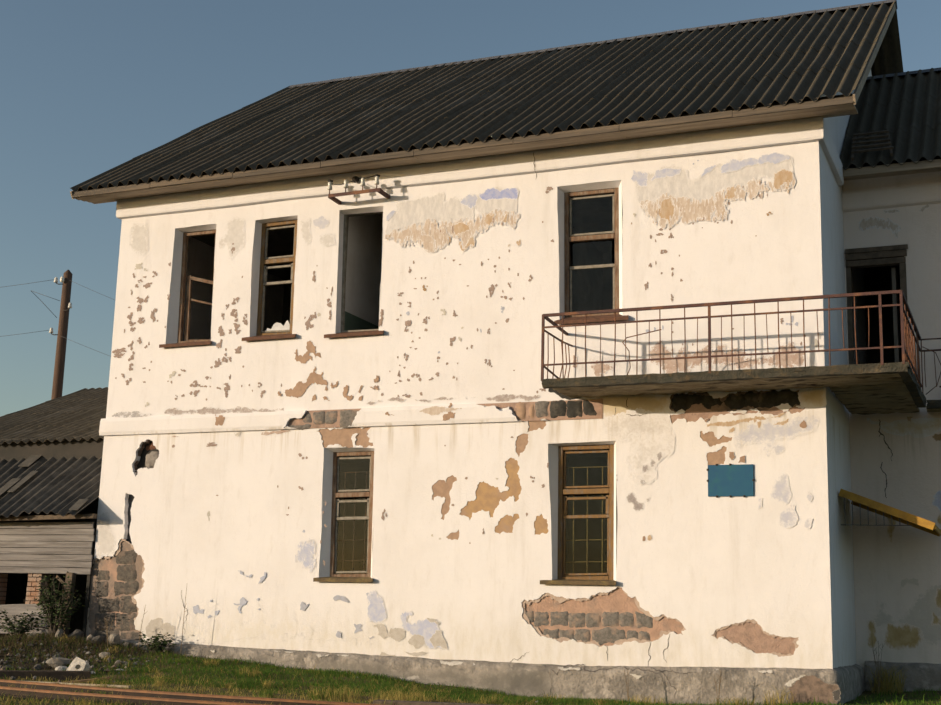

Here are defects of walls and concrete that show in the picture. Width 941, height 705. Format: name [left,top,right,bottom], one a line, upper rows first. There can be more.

peeling [385,186,521,272]
peeling [631,152,796,282]
peeling [112,263,166,385]
peeling [175,297,266,401]
peeling [261,261,462,436]
spalling [134,440,159,475]
peeling [432,388,603,535]
peeling [670,392,805,465]
crack [878,420,893,498]
flaking render [88,494,175,642]
flaking render [525,588,683,646]
flaking render [715,622,795,655]